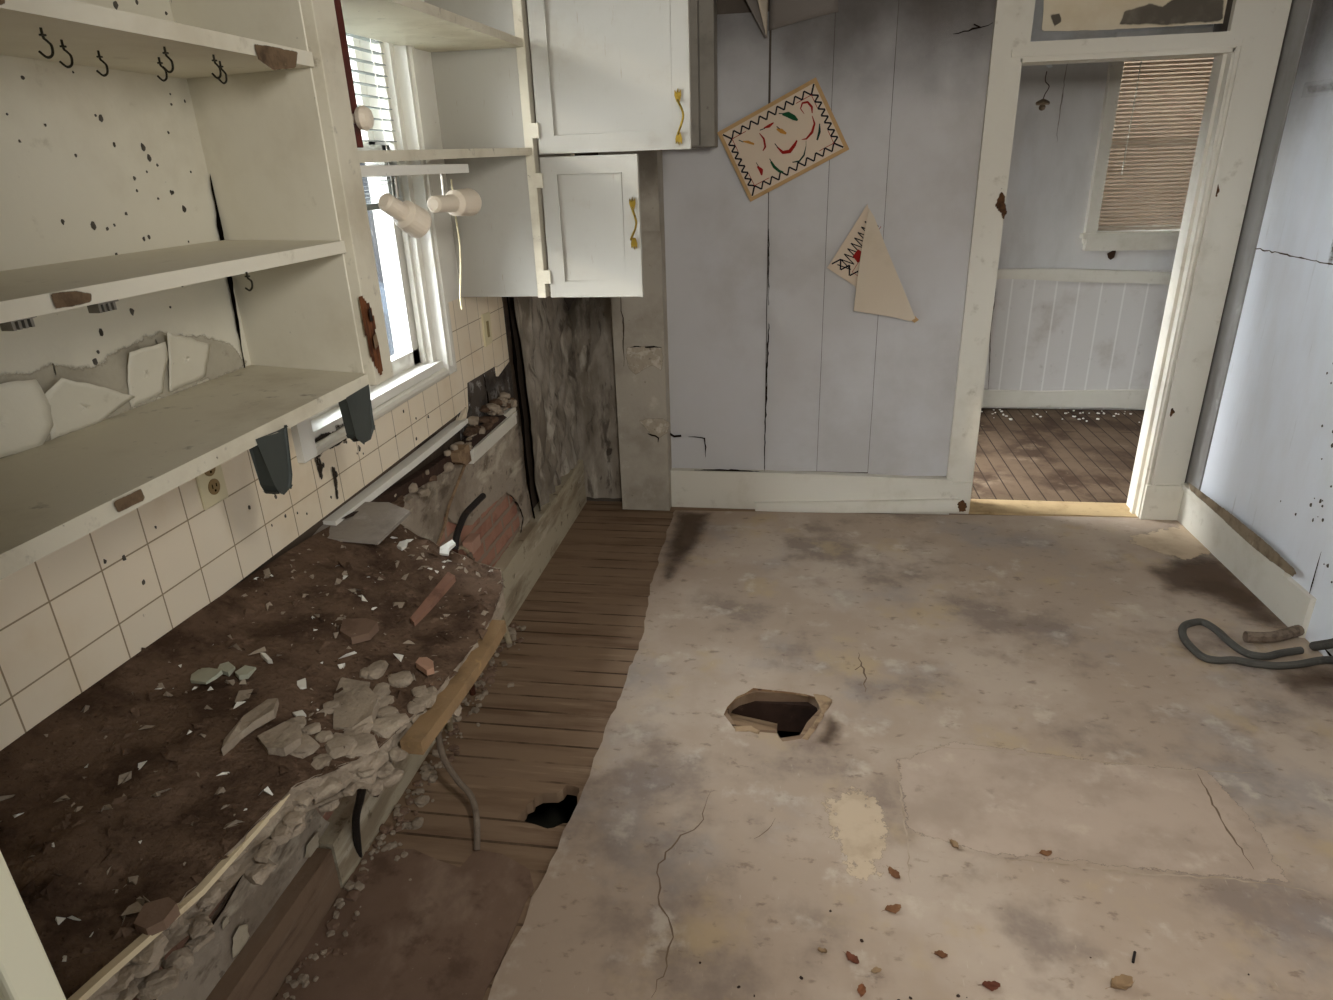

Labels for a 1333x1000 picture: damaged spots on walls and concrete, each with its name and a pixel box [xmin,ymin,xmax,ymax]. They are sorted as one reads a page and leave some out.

peeling [1042,0,1227,31]
peeling [0,332,246,459]
peeling [114,489,145,512]
water stain [1154,557,1281,624]
peeling [304,797,342,858]
peeling [209,893,249,958]
crack [651,797,708,998]